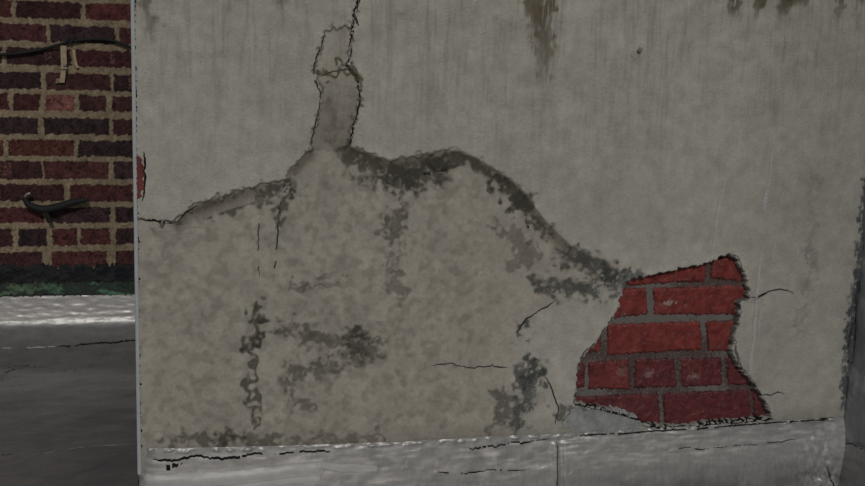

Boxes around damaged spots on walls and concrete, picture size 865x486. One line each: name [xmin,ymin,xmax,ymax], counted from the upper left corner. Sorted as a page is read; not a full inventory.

crack [310,0,361,146]
spalling [136,152,147,201]
water stain [240,301,268,426]
water stain [498,354,548,430]
crack [432,178,865,485]
spalling [561,254,773,433]
crack [153,450,330,471]